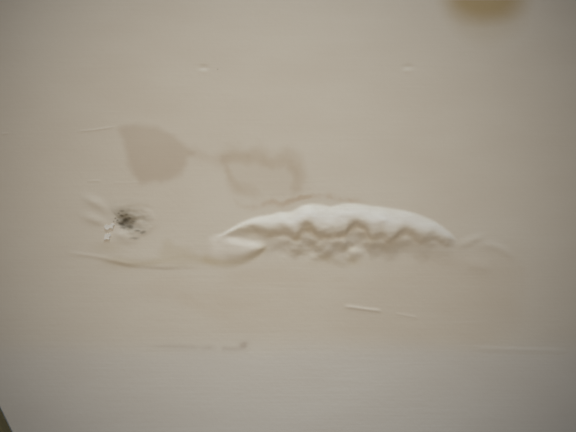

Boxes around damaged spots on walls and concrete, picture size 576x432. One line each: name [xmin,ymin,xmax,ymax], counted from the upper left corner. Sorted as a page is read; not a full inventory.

water stain [115,120,370,213]
peeling [76,189,162,246]